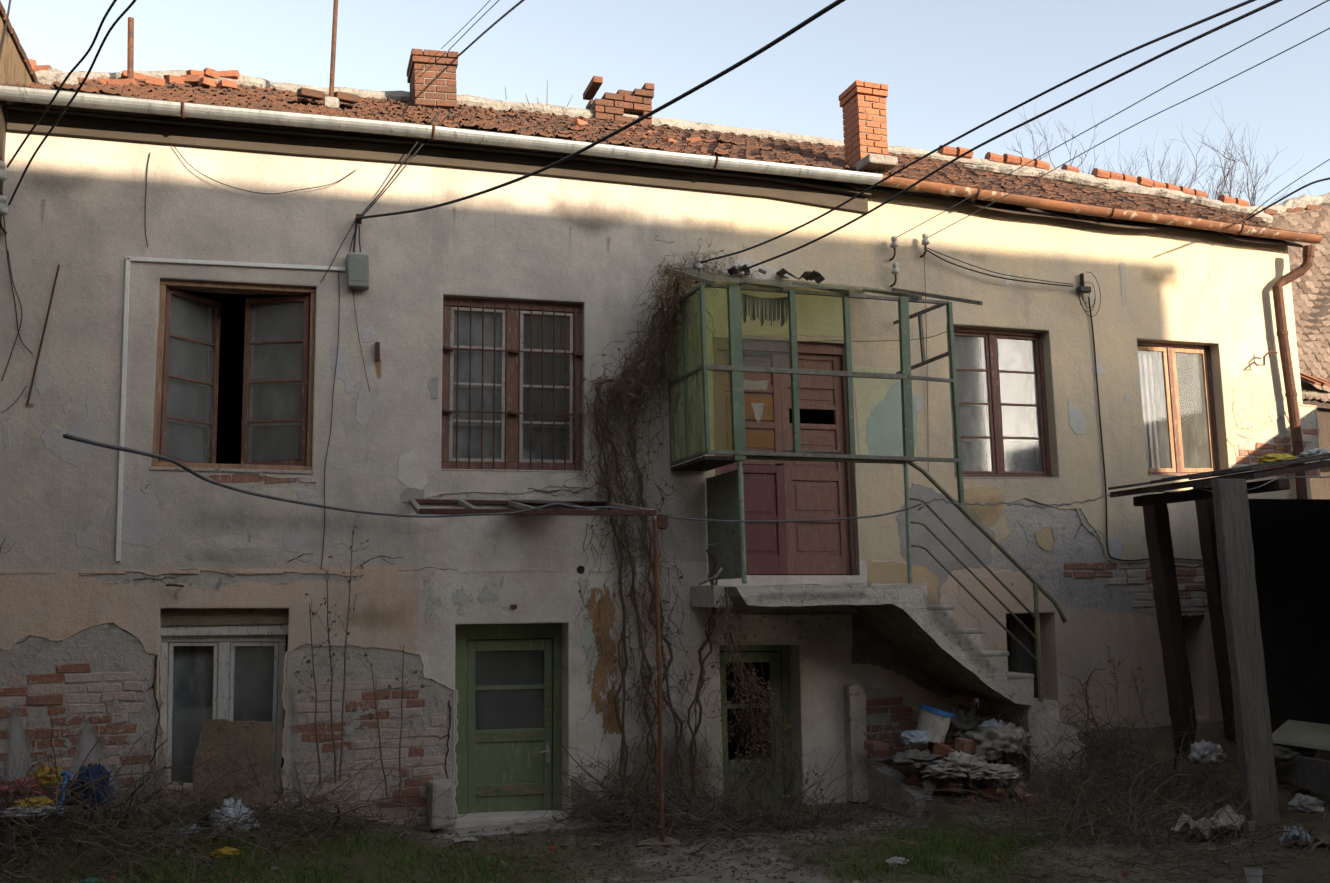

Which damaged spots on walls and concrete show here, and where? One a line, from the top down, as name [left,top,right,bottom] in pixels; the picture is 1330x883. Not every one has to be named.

flaking render [1231,369,1324,479]
peeling [574,578,599,691]
flaking render [866,482,1157,651]
crack [1017,498,1106,562]
flaking render [1175,564,1209,617]
flaking render [0,621,168,812]
flaking render [281,643,458,830]